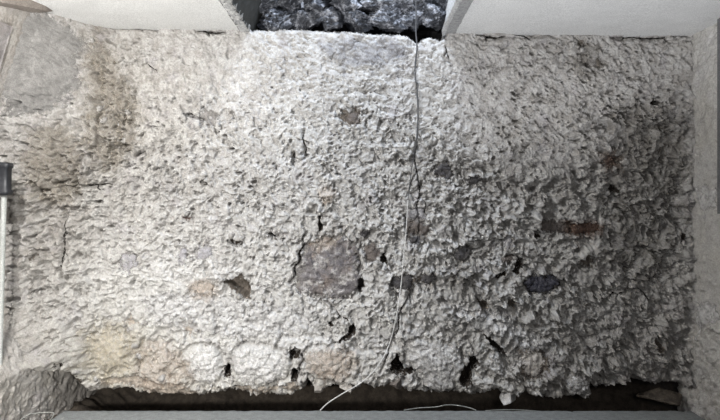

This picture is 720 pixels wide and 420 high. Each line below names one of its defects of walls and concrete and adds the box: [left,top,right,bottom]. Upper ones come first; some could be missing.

spalling [336,105,368,132]
crack [410,141,426,222]
crack [60,220,68,267]
spalling [184,273,255,307]
crack [293,231,308,278]
spalling [288,215,393,309]
spalling [477,252,563,311]
crack [381,283,418,371]
hole [389,353,423,376]
hole [458,350,481,388]